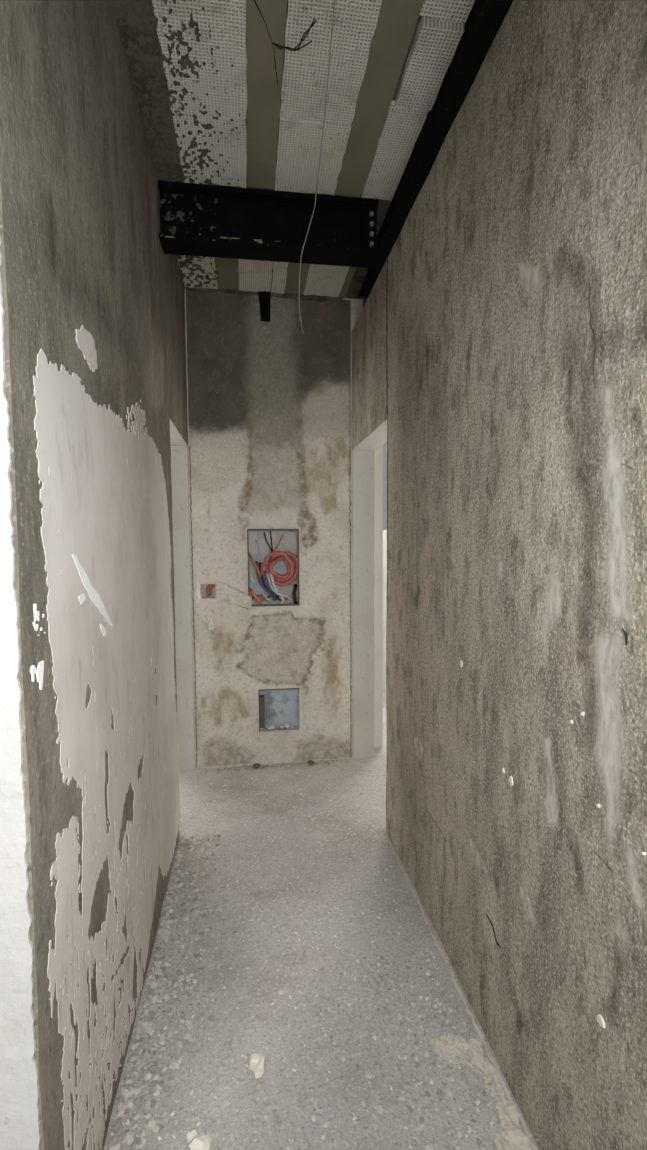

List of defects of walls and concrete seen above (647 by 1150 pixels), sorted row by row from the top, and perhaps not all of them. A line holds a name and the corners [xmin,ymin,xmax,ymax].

peeling [30,325,180,1150]
damp [177,255,351,511]